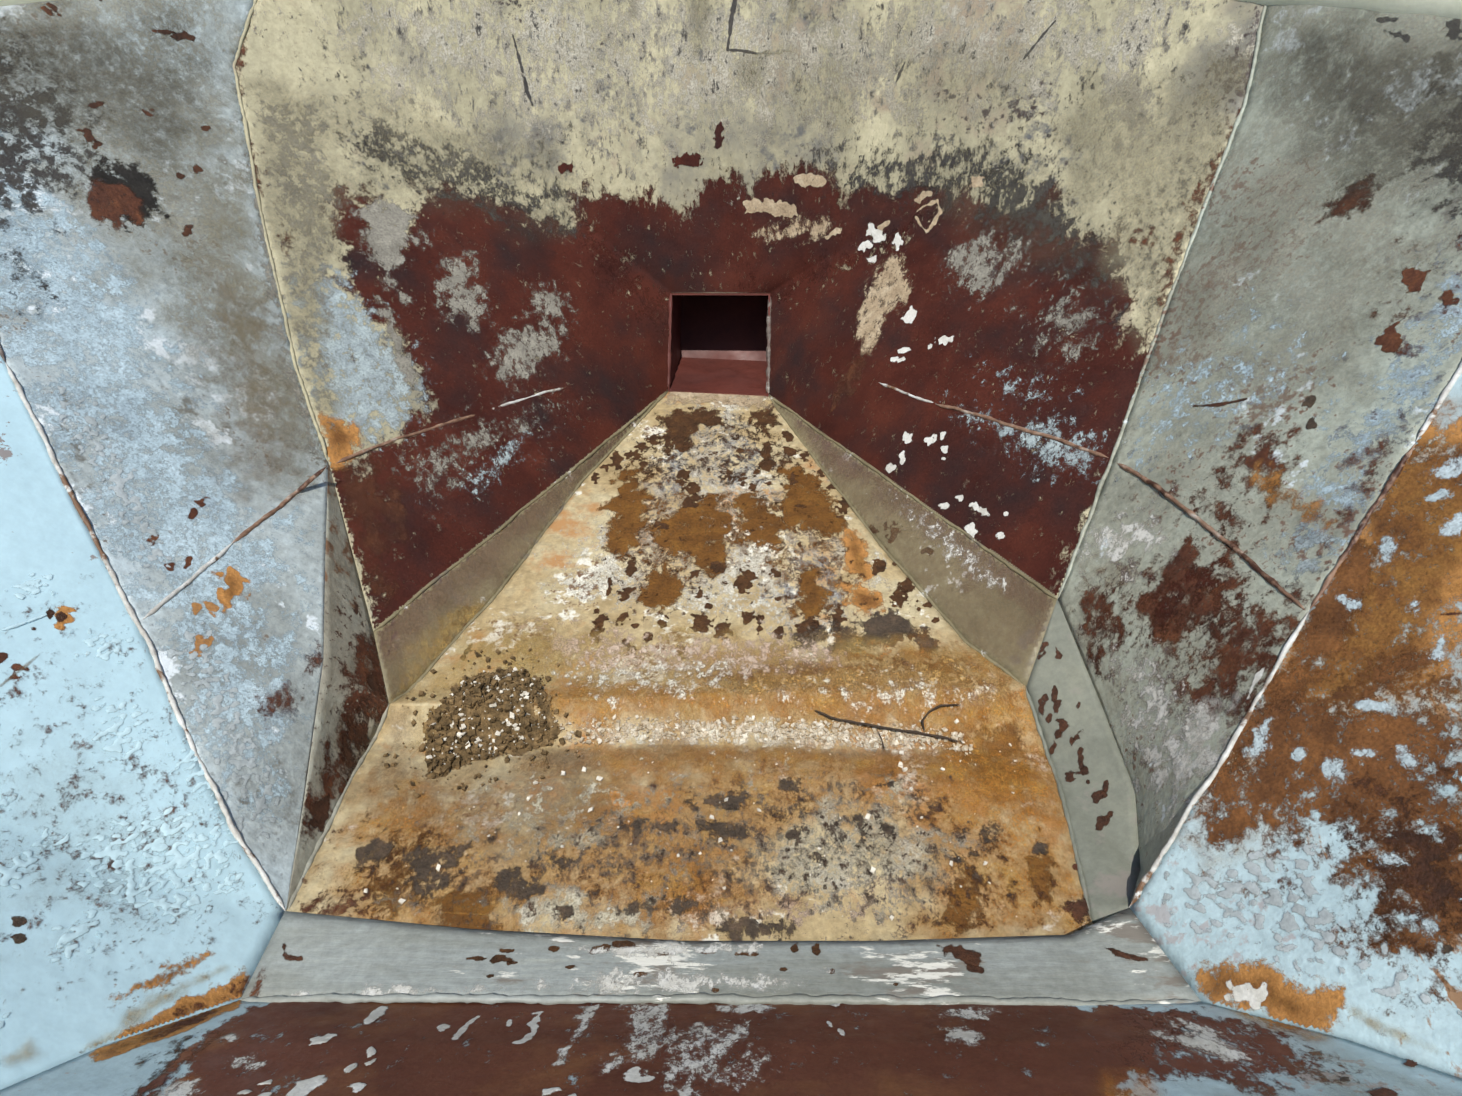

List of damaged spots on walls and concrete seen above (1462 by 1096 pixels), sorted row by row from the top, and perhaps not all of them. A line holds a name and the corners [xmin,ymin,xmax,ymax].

rust [76,128,193,237]
peeling [240,109,1241,629]
rust [607,465,892,627]
rust [1074,398,1462,1016]
rust [298,629,1089,941]
rust [0,687,265,1062]
peeling [466,949,518,978]
peeling [589,940,636,955]
peeling [124,988,1398,1096]
peeling [779,943,821,971]
peeling [936,944,984,974]
rust [1191,958,1346,1039]